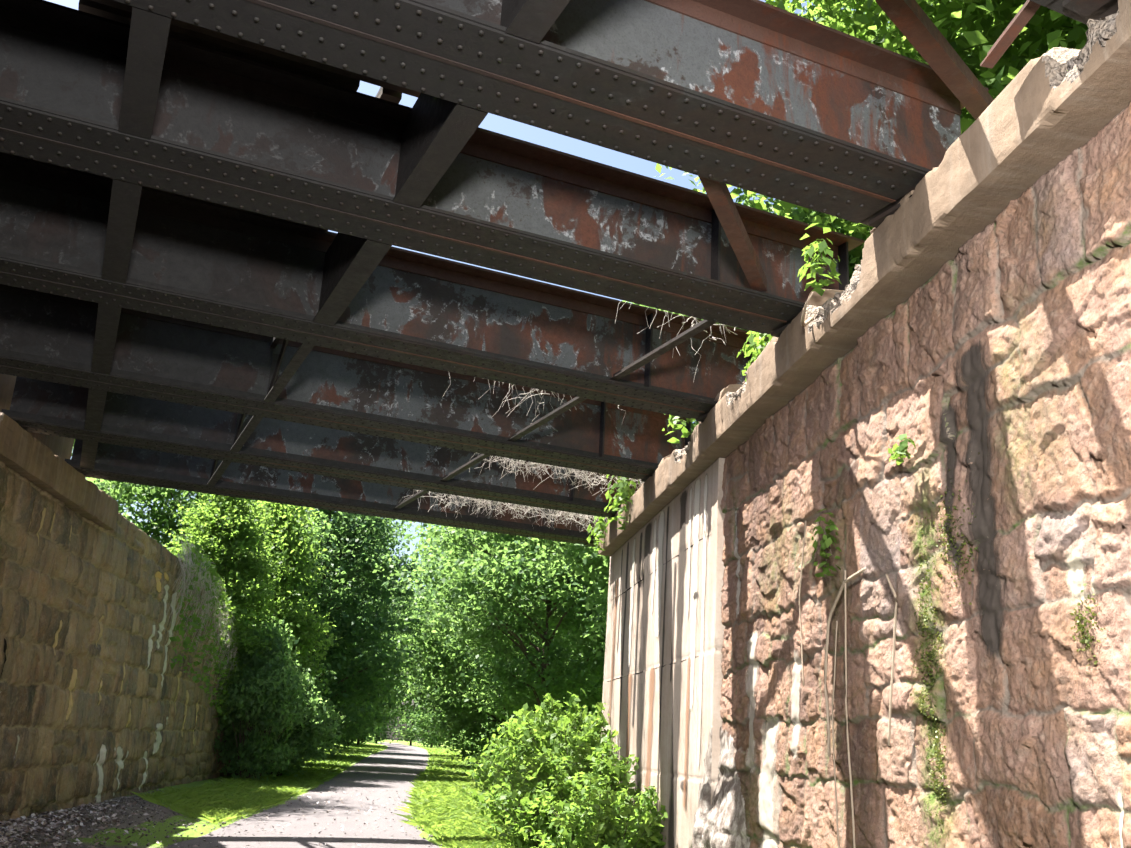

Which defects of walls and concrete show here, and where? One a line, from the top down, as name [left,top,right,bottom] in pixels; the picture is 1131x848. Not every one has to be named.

water stain [66,668,78,720]
water stain [139,584,199,791]
water stain [93,744,129,803]